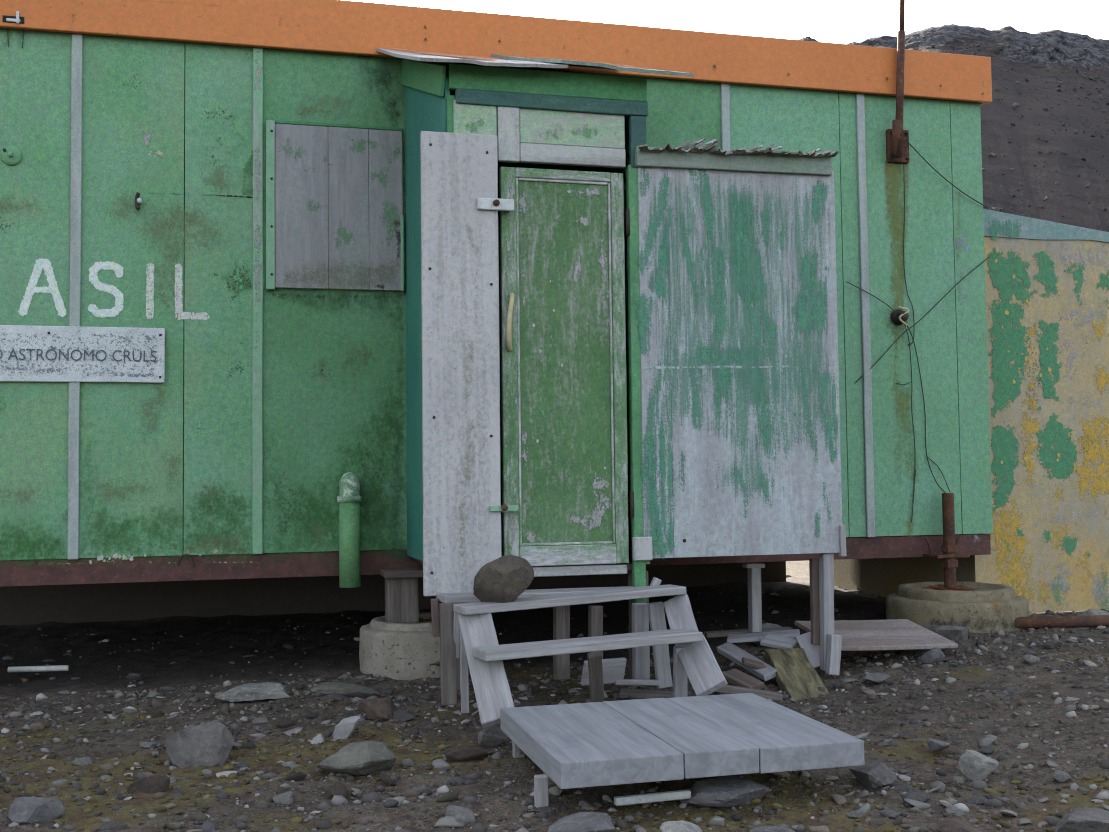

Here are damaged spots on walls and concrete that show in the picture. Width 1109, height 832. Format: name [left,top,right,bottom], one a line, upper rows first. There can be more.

peeling [560,187,600,196]
corrosion [886,163,907,310]
peeling [637,168,838,558]
peeling [986,219,1109,603]
peeling [570,467,622,539]
peeling [26,690,197,733]
peeling [200,677,356,789]
peeling [507,667,590,707]
peeling [383,745,449,806]
peeling [433,797,481,829]
peeling [823,759,974,819]
peeling [970,797,1048,826]